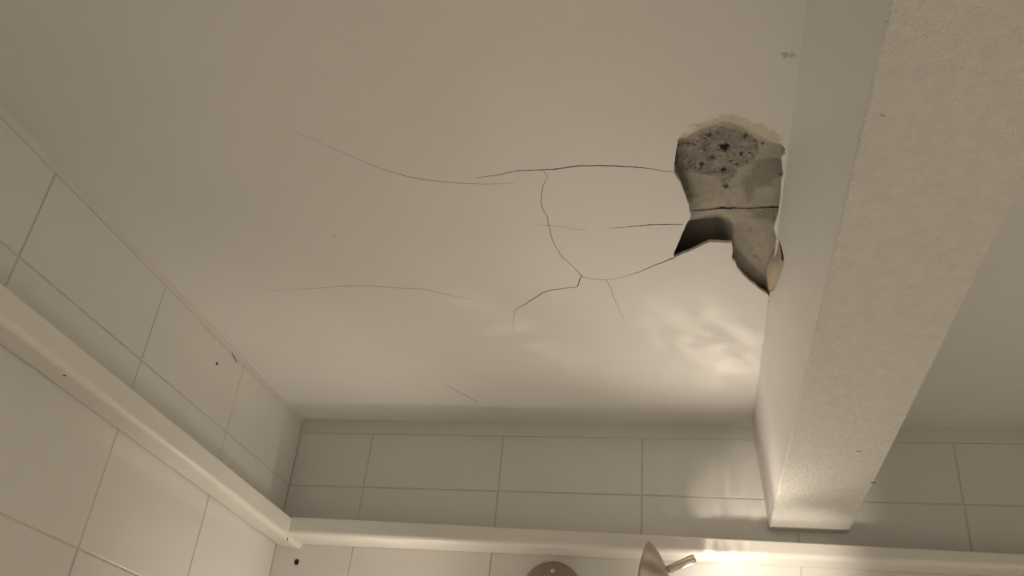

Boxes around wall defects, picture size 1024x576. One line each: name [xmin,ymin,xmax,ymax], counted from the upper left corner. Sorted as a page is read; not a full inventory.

crack [293,130,683,331]
spalling [674,122,785,293]